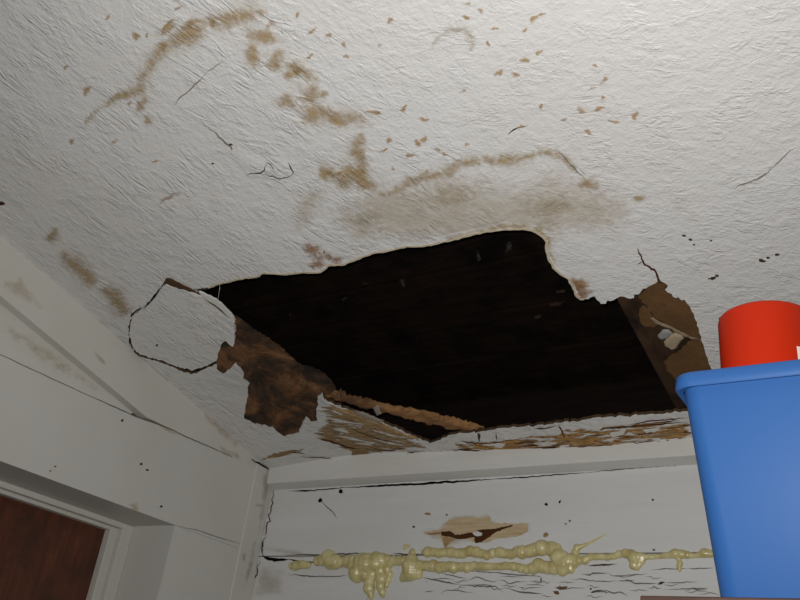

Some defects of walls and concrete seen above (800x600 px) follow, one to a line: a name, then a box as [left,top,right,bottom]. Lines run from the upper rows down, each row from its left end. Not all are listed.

crack [175,61,223,104]
crack [248,162,294,179]
crack [733,148,795,189]
spalling [164,228,584,300]
crack [637,249,661,283]
spalling [638,282,711,379]
peeling [262,449,331,460]
peeling [315,405,425,455]
peeling [440,418,692,451]
crack [255,490,358,578]
crack [422,564,716,598]